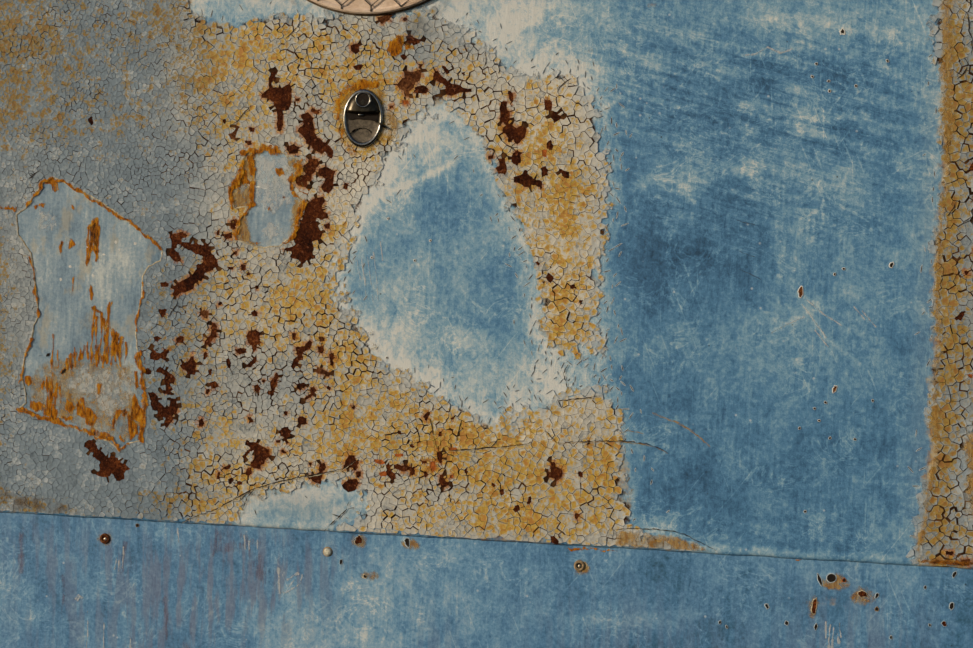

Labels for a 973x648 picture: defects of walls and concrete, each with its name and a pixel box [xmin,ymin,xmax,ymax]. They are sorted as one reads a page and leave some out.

peeling [1,176,163,452]
rust [146,309,219,427]
rust [160,232,250,296]
peeling [228,144,311,269]
rust [261,71,300,131]
rust [291,333,335,400]
rust [284,108,348,265]
crack [0,0,716,551]
rust [334,34,472,155]
rust [488,91,569,190]
crack [906,0,973,568]
rust [217,411,307,485]